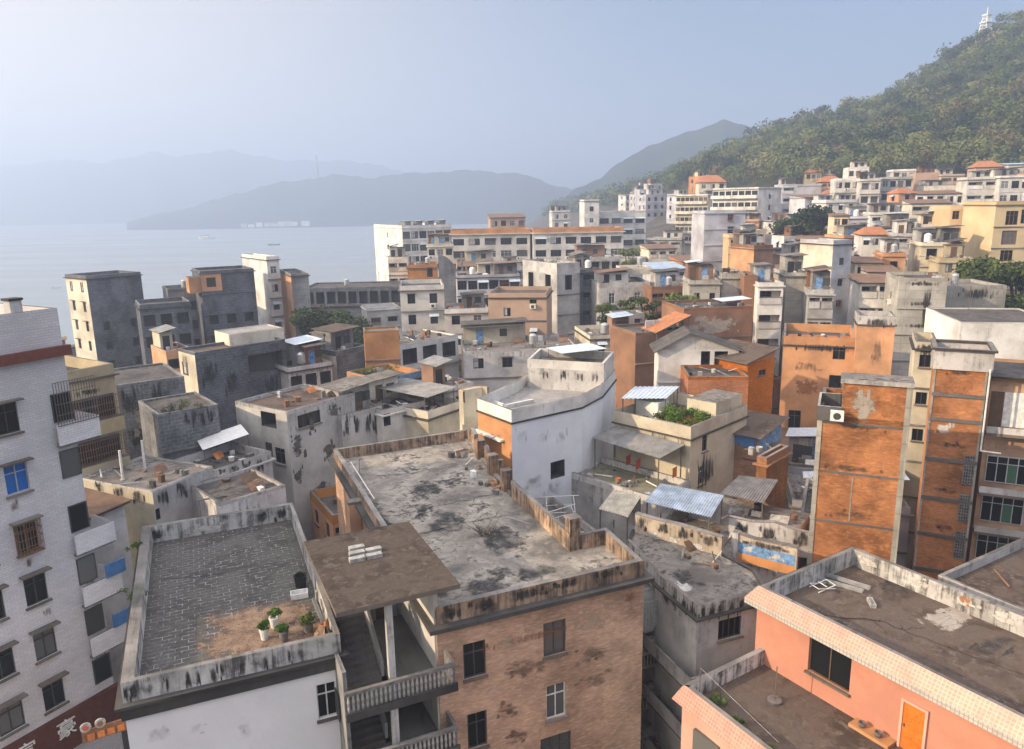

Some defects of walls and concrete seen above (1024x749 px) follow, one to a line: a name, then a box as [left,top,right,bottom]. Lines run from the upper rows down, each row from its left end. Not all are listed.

damp [343,414,377,436]
damp [257,510,286,522]
damp [639,518,717,546]
damp [517,577,577,600]
damp [444,598,493,620]
damp [186,665,224,688]
damp [123,685,137,702]